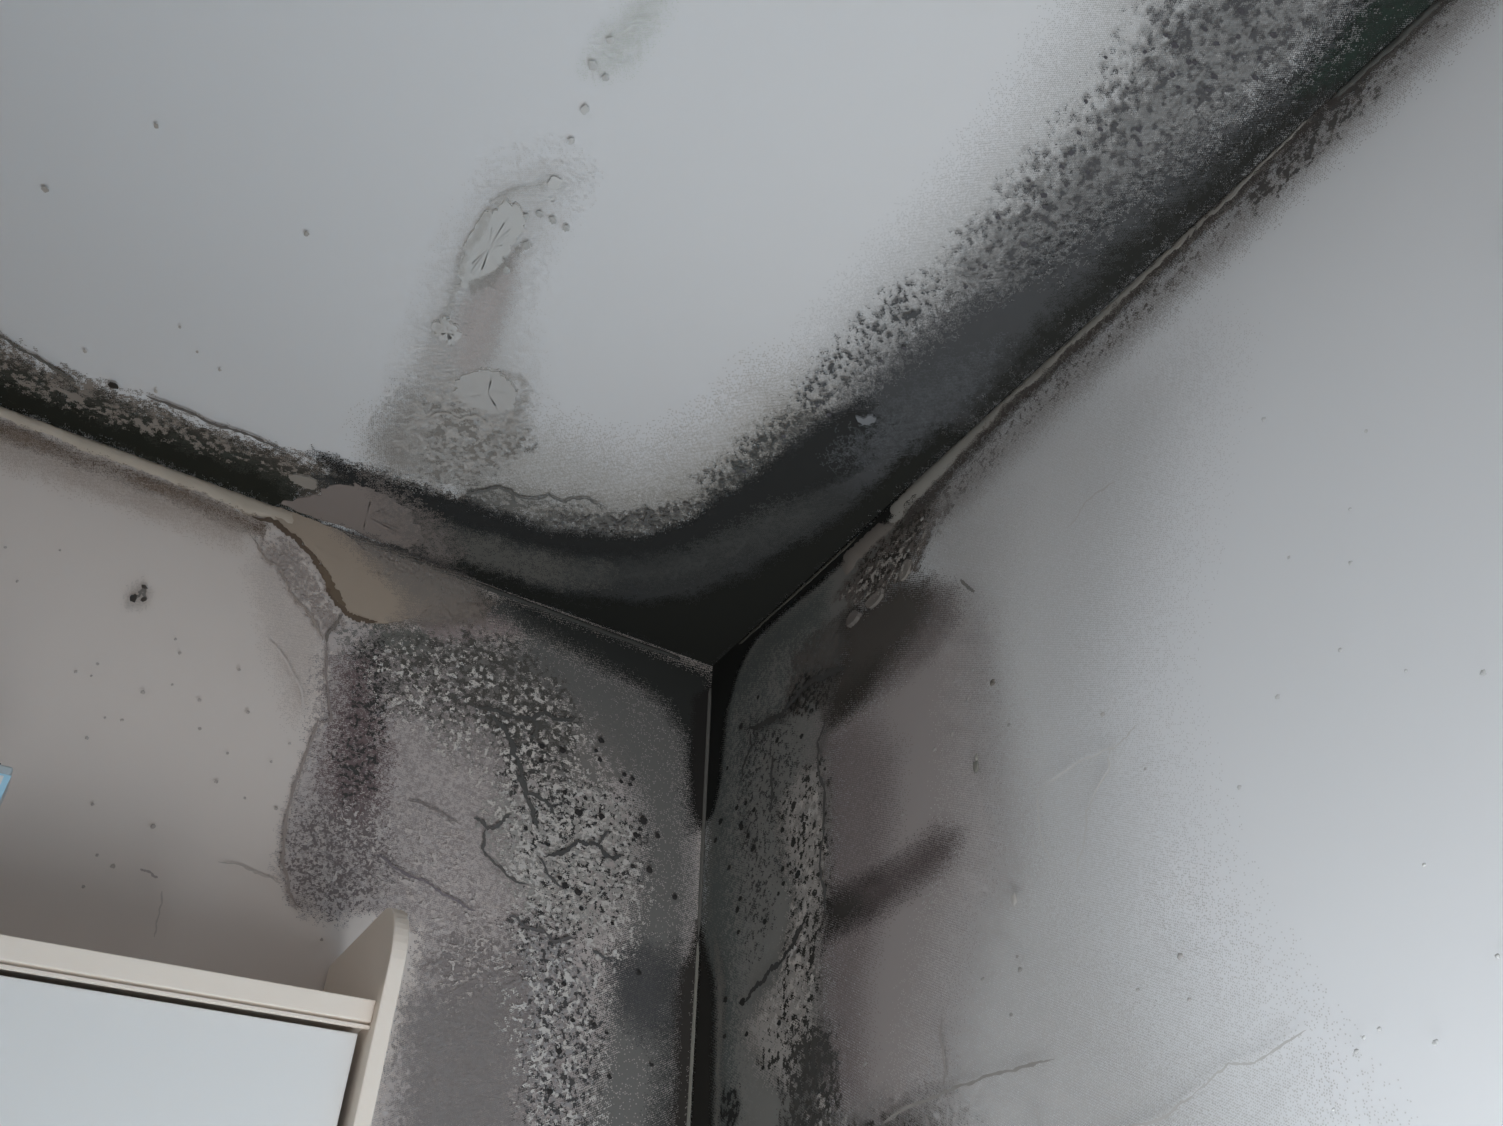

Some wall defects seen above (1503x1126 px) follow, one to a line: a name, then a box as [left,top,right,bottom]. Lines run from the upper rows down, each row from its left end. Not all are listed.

peeling [459,198,526,289]
peeling [454,367,519,415]
peeling [273,473,437,624]
crack [377,706,625,962]
crack [742,718,827,1002]
crack [881,1017,1055,1126]
crack [1197,1030,1306,1091]